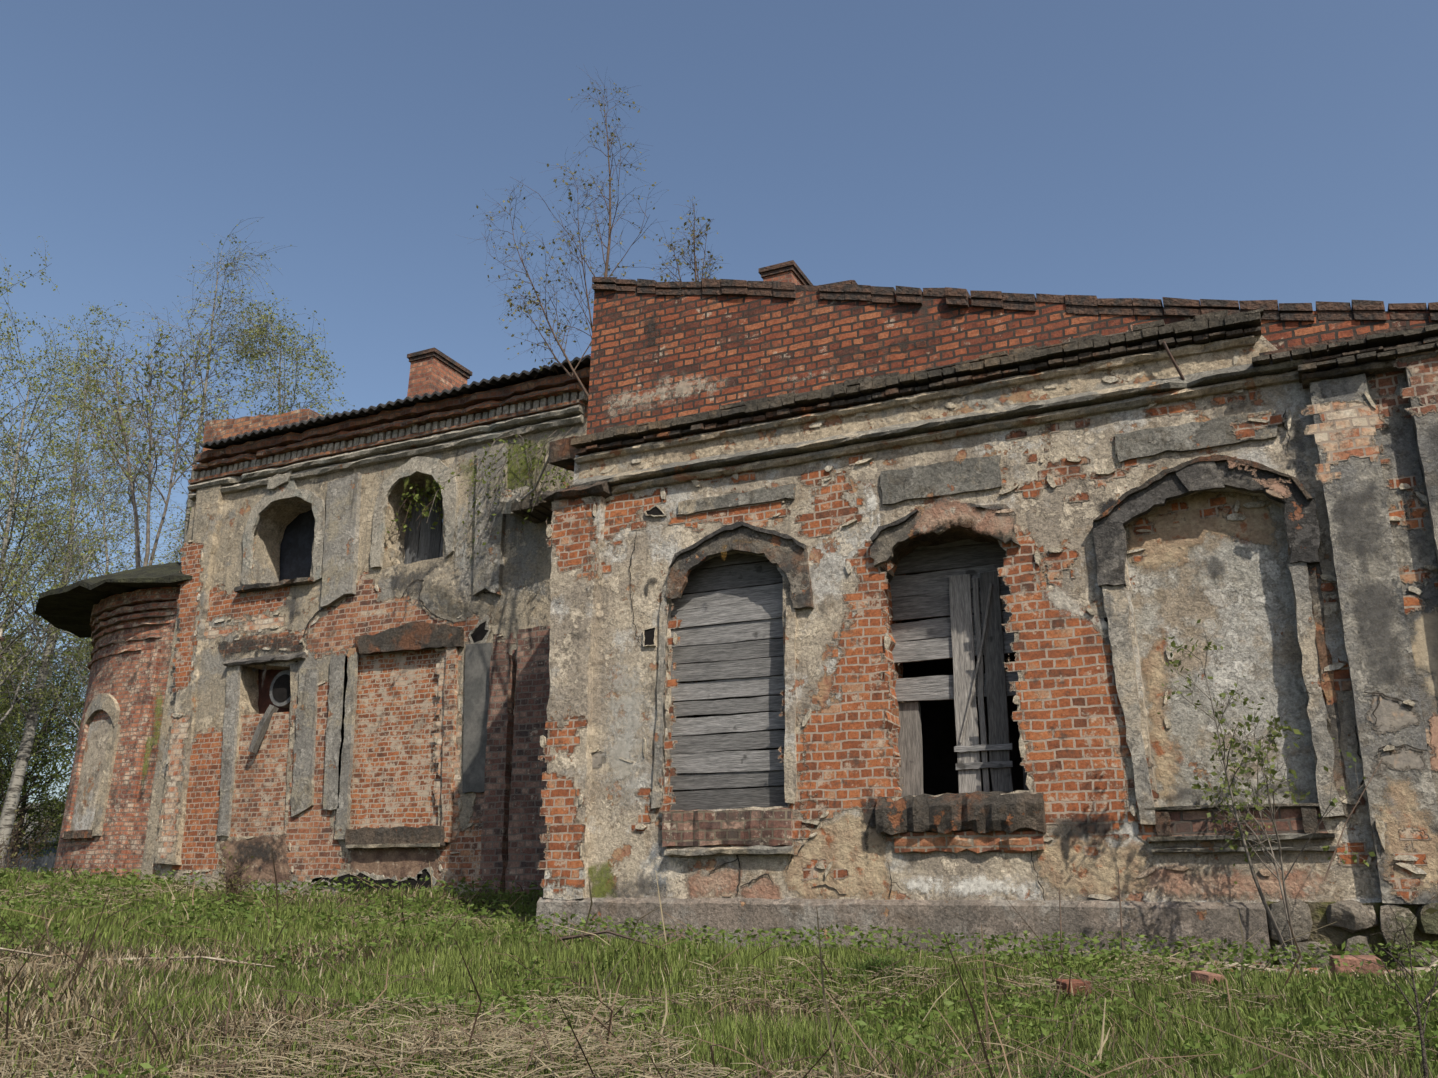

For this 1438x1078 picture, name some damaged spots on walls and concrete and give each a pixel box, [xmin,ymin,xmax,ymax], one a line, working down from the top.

flaking render [157,539,517,894]
flaking render [537,447,904,900]
flaking render [914,417,1324,901]
flaking render [1142,346,1438,531]
flaking render [1309,574,1339,616]
flaking render [1319,658,1352,704]
water stain [1334,484,1381,569]
water stain [1354,583,1401,683]
peeling [1328,559,1438,903]